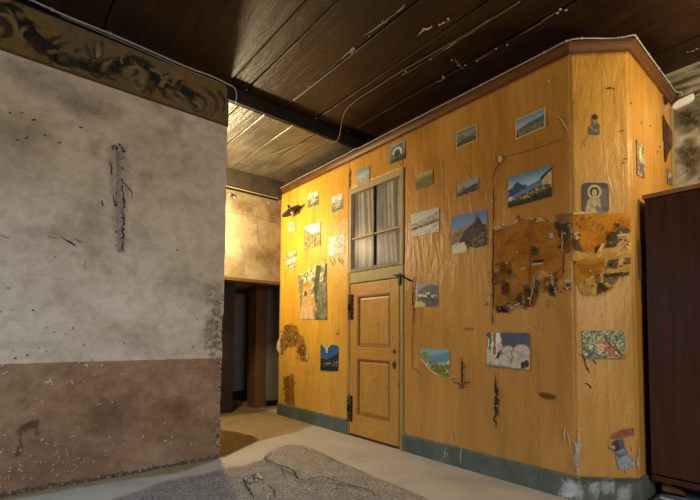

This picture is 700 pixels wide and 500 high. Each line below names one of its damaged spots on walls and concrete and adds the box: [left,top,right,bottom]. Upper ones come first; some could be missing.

crack [492,372,500,430]